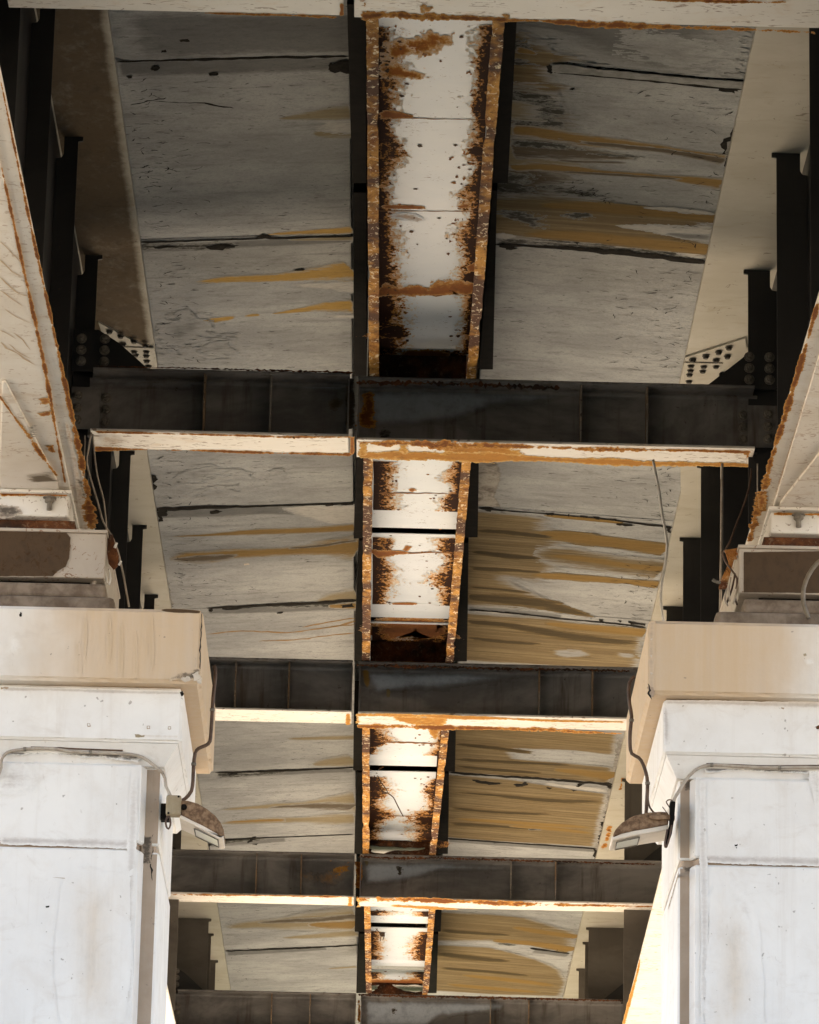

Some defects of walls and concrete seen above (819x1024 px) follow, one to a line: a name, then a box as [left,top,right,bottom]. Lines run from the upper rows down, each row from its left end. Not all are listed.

rust [356,0,815,379]
rust [0,83,751,688]
rust [747,304,819,542]
rust [173,713,652,1024]
damp [540,782,607,793]